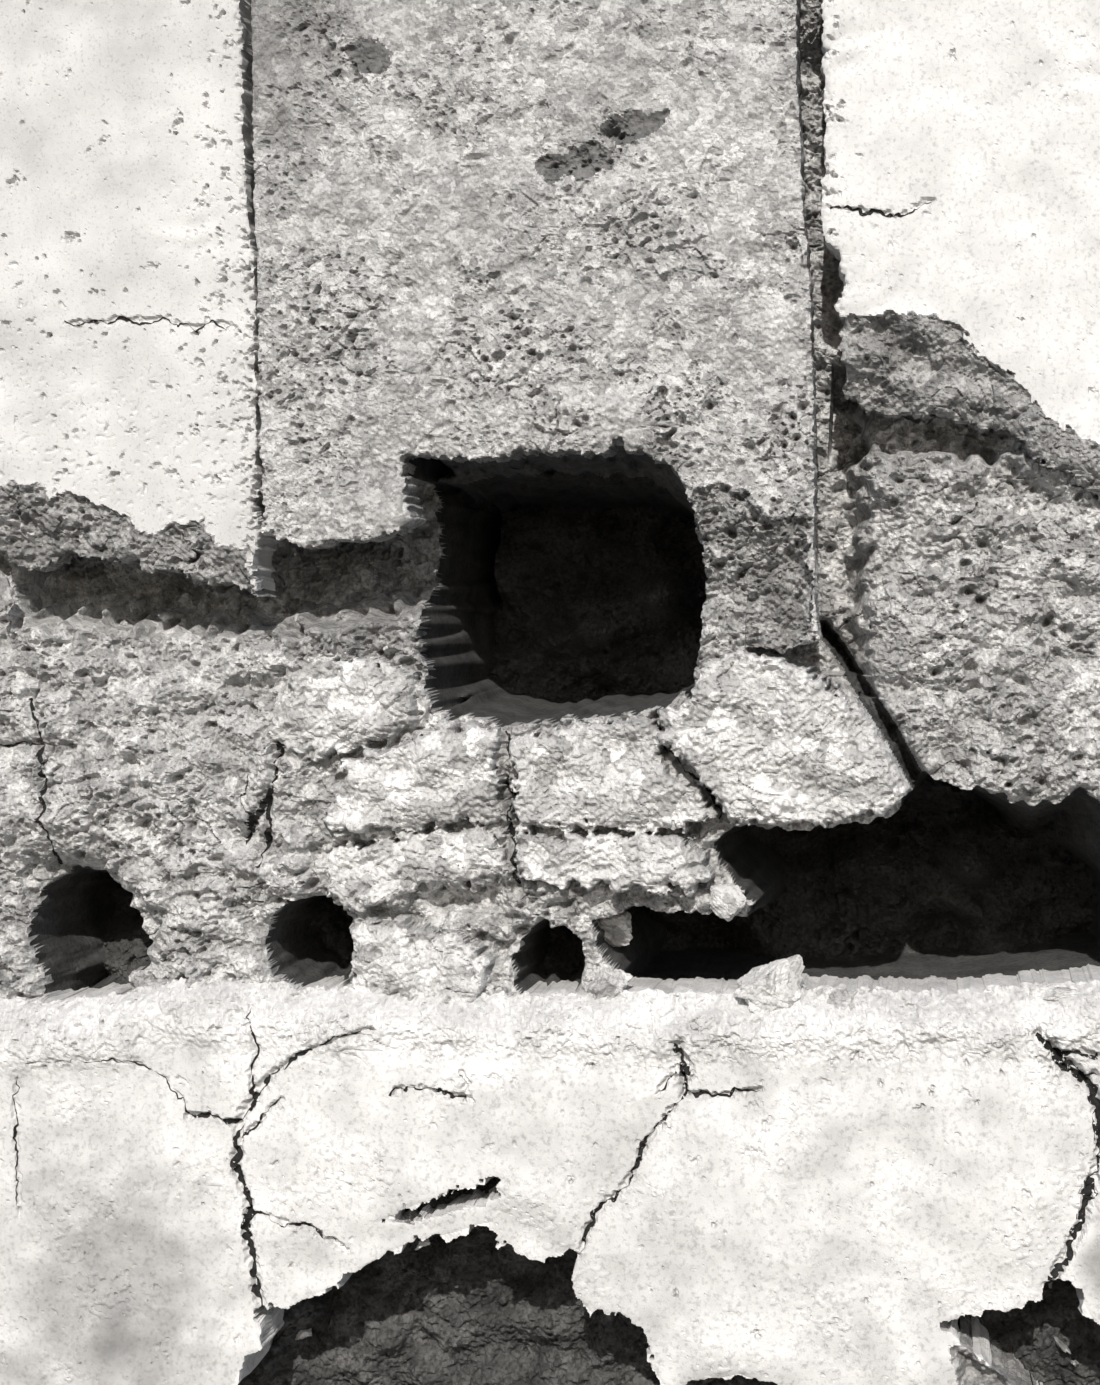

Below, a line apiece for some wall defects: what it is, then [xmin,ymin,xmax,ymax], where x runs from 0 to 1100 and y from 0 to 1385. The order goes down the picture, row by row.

crack [830,202,931,217]
spalling [837,310,1100,503]
spalling [0,480,276,612]
spalling [690,483,814,654]
crack [819,620,928,789]
crack [239,741,285,896]
spalling [592,771,1100,981]
crack [12,1005,373,1310]
crack [581,1043,759,1252]
crack [1035,1032,1100,1289]
spalling [238,1225,660,1385]
spalling [949,1278,1100,1385]